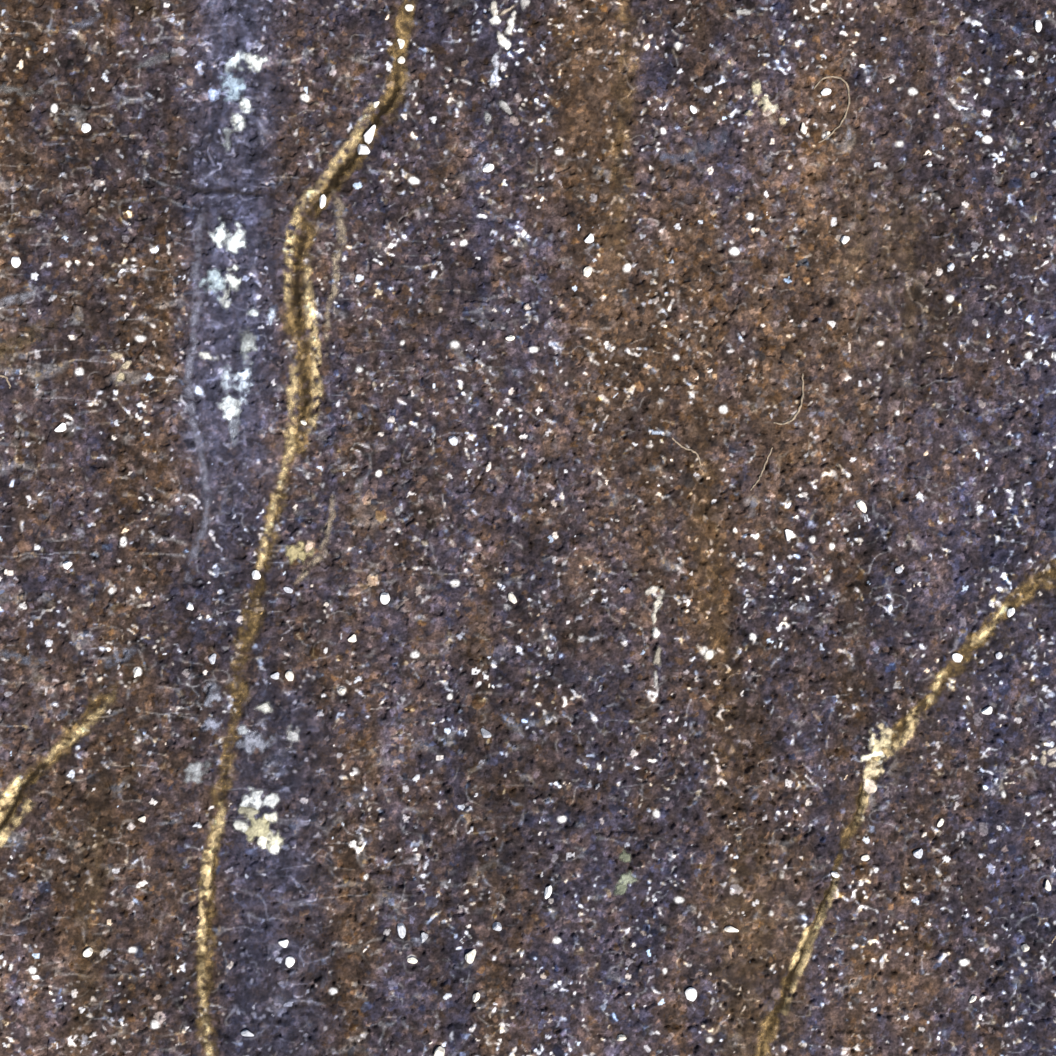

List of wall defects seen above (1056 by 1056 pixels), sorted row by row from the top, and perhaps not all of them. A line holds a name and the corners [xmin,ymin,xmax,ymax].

damp [185,0,274,557]
crack [196,0,414,1054]
crack [0,695,115,845]
damp [185,763,209,782]
damp [202,684,221,729]
damp [237,726,269,753]
damp [286,722,303,741]
crack [755,559,1056,1056]